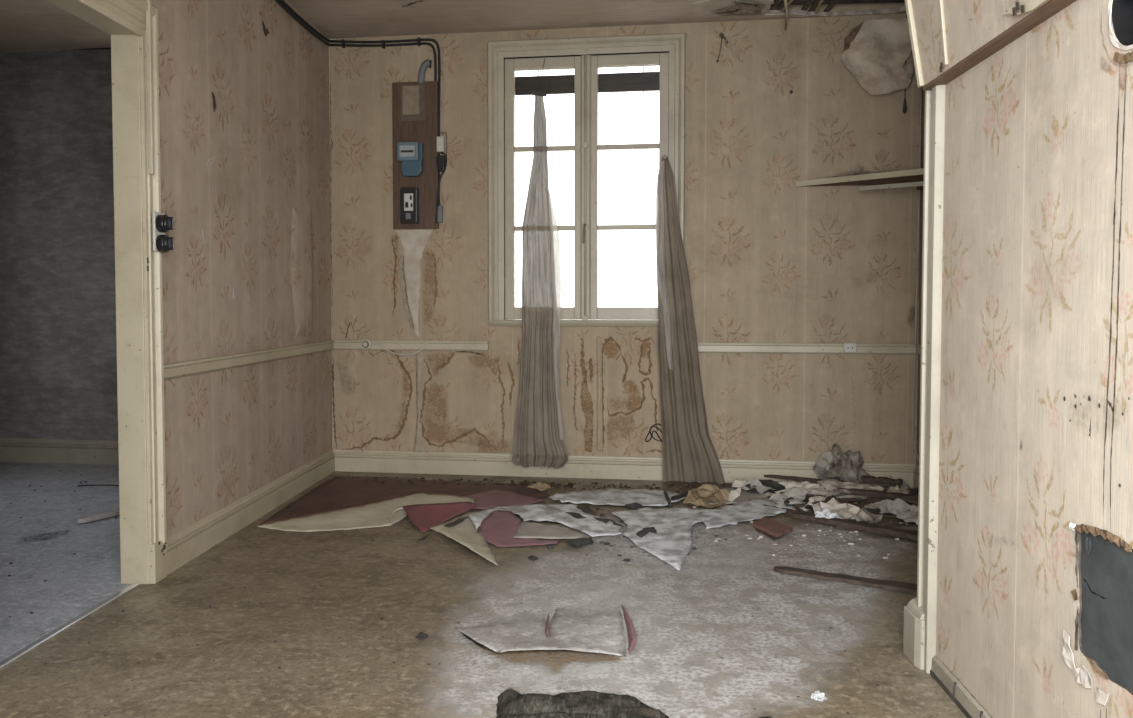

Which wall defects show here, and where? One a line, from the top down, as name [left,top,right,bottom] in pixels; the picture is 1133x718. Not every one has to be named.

spalling [690,0,809,19]
flaking render [396,230,432,338]
leakage [351,339,520,452]
leakage [602,337,658,451]
spalling [1062,522,1133,705]